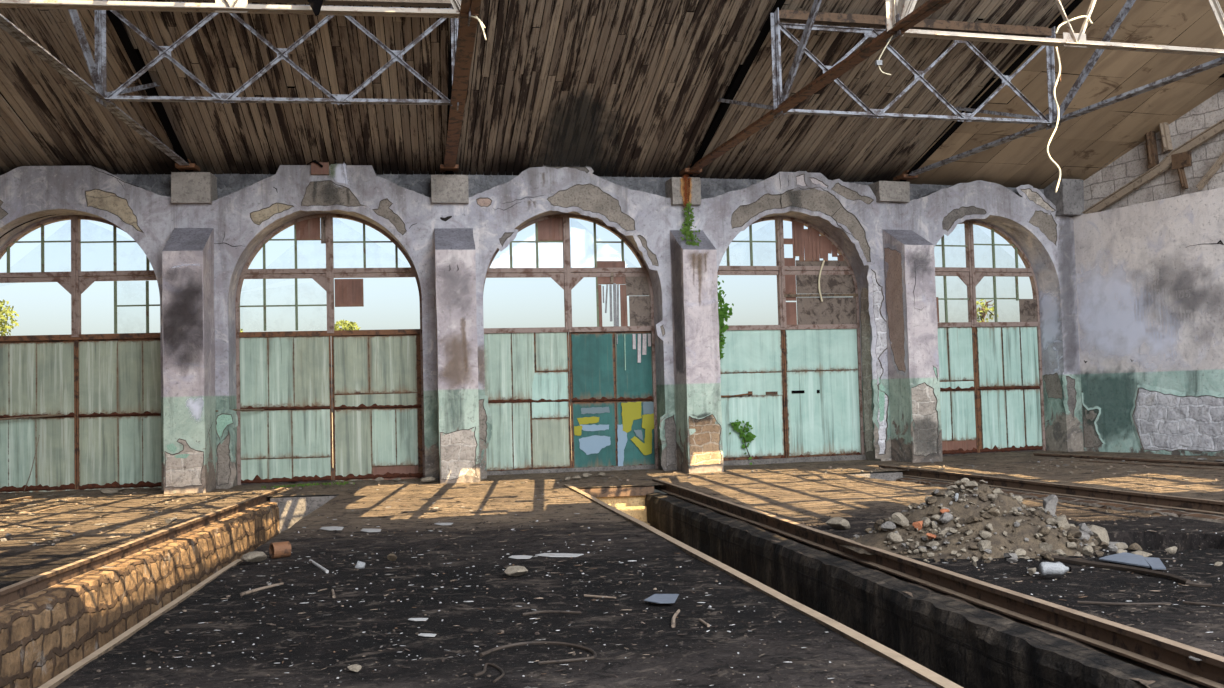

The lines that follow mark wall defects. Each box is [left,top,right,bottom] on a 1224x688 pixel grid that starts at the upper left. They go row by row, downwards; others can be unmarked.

spalling [245,160,411,240]
spalling [540,164,663,271]
spalling [938,202,989,236]
spalling [1016,184,1060,250]
spalling [726,170,955,488]
leakage [1041,219,1178,369]
peeling [164,409,238,493]
peeling [659,409,723,471]
spalling [1042,369,1107,452]
leakage [1081,372,1133,436]
spalling [1130,383,1224,456]
spalling [0,494,339,688]